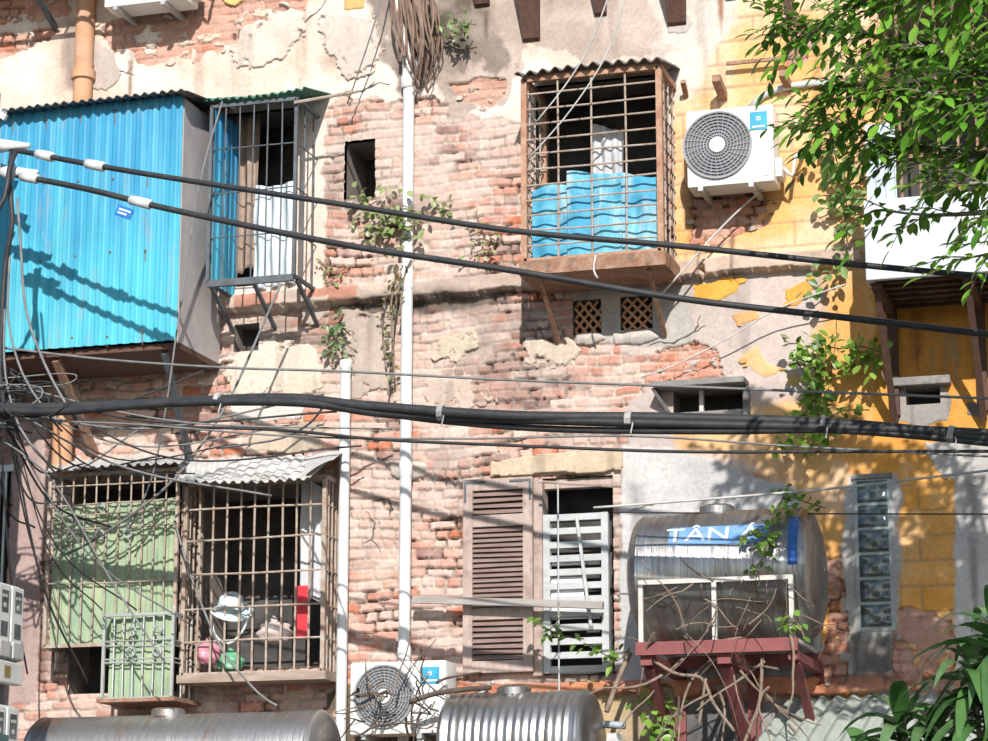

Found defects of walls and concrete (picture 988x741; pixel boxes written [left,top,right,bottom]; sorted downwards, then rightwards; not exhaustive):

spalling [0,0,71,59]
spalling [92,0,386,91]
spalling [450,77,506,112]
spalling [685,188,778,247]
spalling [655,341,732,381]
spalling [822,556,850,686]
spalling [892,607,958,694]